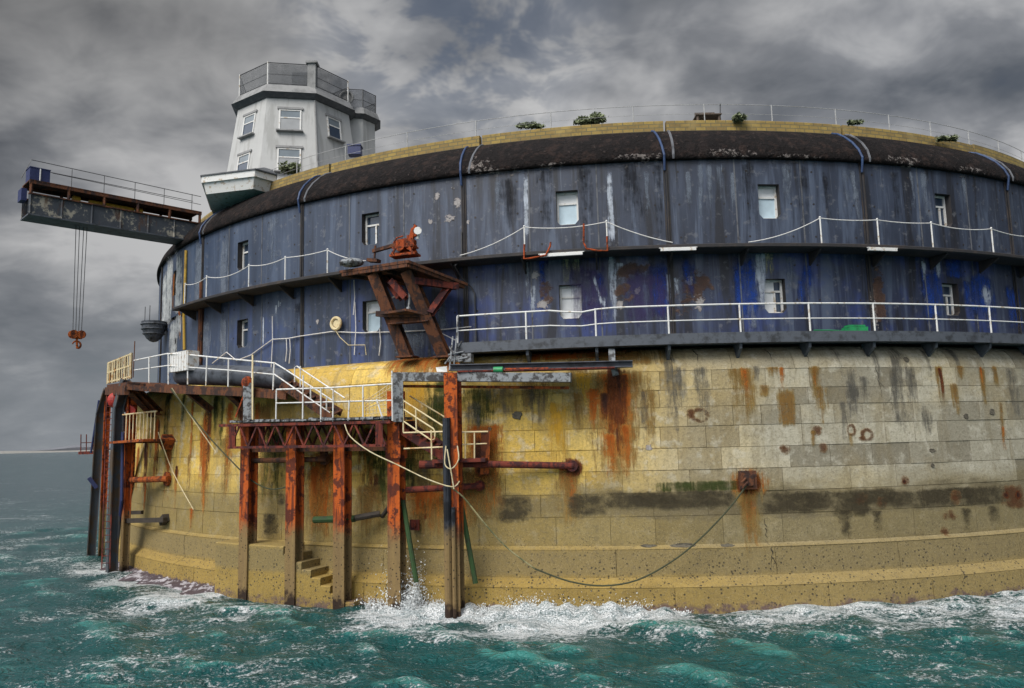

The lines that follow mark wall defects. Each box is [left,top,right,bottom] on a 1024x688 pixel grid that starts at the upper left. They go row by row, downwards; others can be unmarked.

peeling [614,262,650,309]
corrosion [730,367,795,426]
corrosion [809,366,827,452]
corrosion [935,366,964,411]
corrosion [517,349,665,522]
corrosion [847,424,873,442]
corrosion [135,402,271,527]
damp [498,497,531,521]
damp [568,490,734,514]
corrosion [732,469,769,538]
damp [764,486,1005,533]